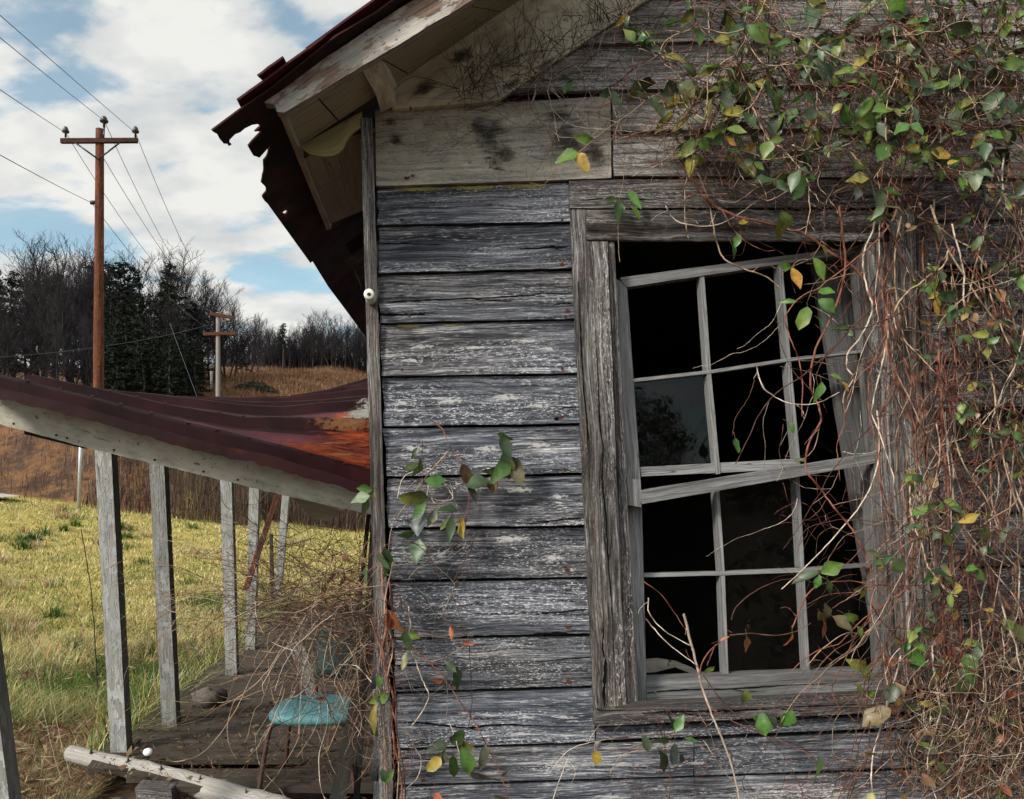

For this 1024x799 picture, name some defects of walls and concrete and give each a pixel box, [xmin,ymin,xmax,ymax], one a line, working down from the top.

water stain [472,120,513,160]
rust [287,412,370,469]